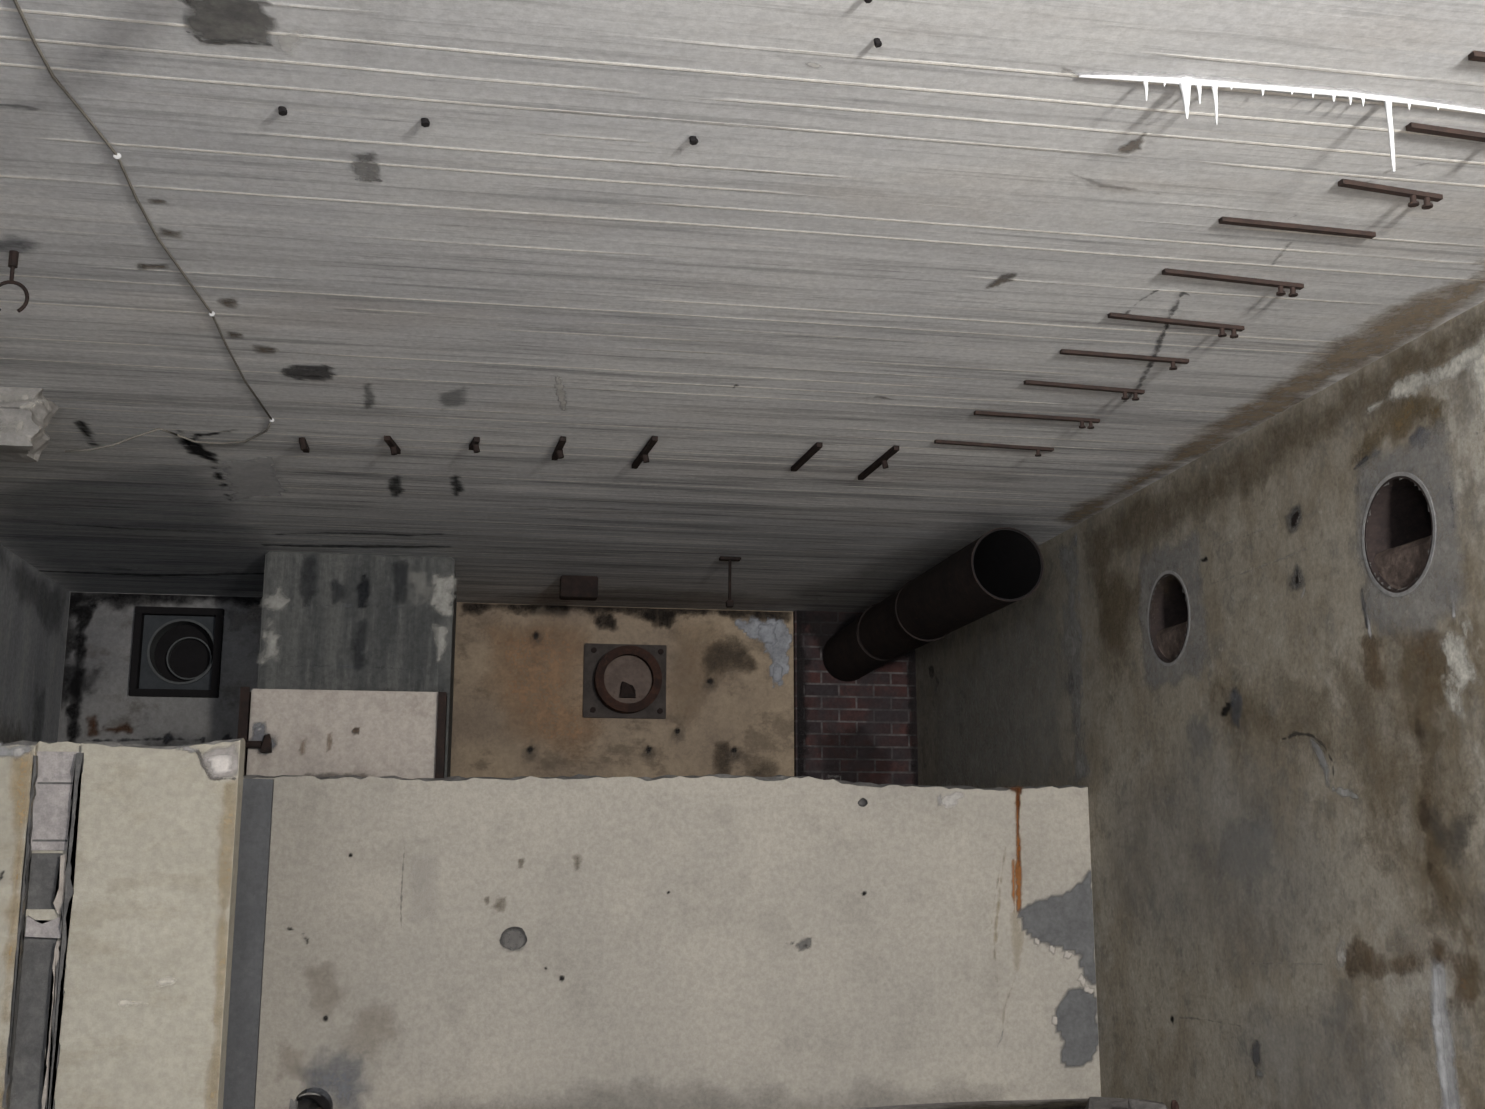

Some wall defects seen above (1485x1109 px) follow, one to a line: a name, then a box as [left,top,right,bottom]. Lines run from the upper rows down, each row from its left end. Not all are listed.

damp [1080,72,1485,111]
damp [705,642,755,672]
peeling [735,618,792,686]
spalling [0,743,31,756]
damp [715,743,729,774]
rust [1010,787,1022,912]
damp [1337,590,1481,1109]
peeling [1018,871,1099,1067]